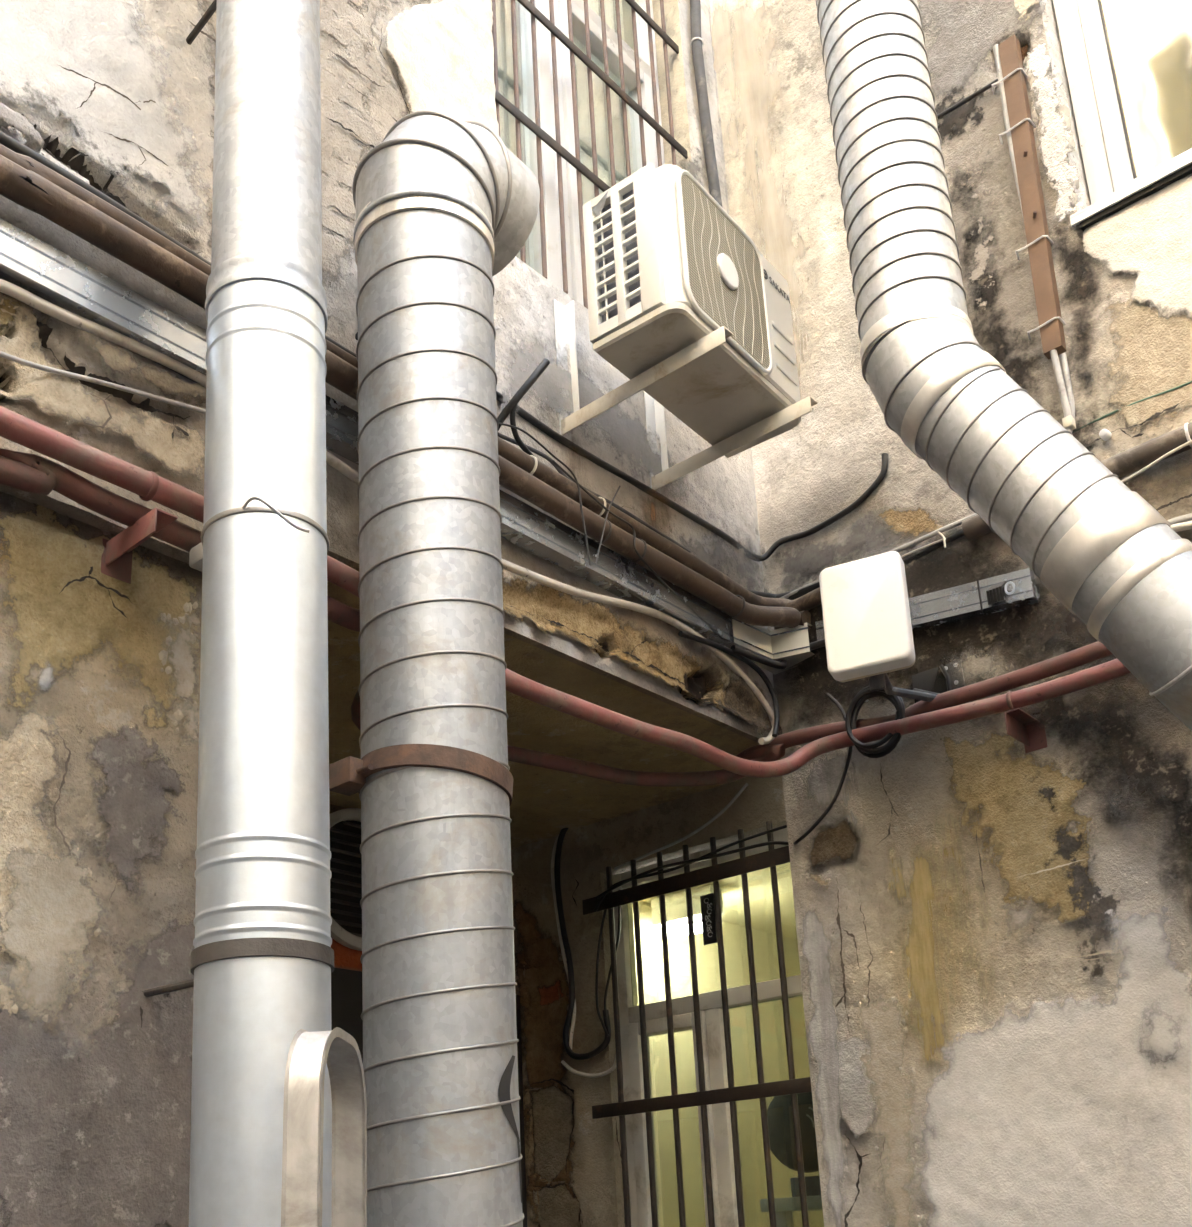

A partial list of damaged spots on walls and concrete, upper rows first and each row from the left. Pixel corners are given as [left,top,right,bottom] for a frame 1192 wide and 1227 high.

crack [12,114,186,217]
crack [59,65,156,110]
flaking render [320,0,424,285]
water stain [935,86,996,148]
flaking render [0,292,205,476]
water stain [962,219,1043,390]
water stain [1053,227,1099,395]
flaking render [1105,296,1192,428]
flaking render [0,504,201,1030]
crack [835,882,873,1035]
water stain [1044,825,1120,983]
crack [844,1124,886,1227]